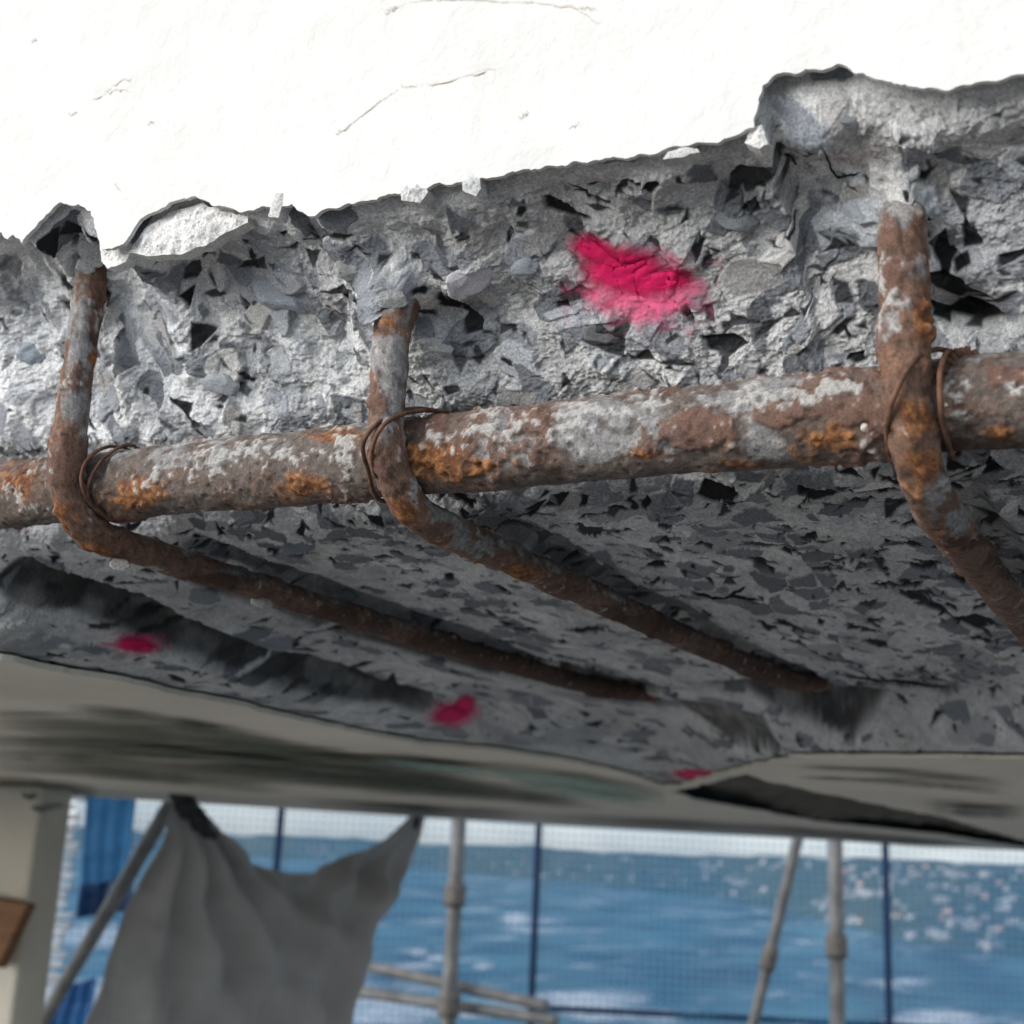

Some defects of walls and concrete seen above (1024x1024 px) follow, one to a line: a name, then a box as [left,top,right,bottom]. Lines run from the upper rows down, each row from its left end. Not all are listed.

spalling [0,67,1024,462]
spalling [0,449,1024,785]